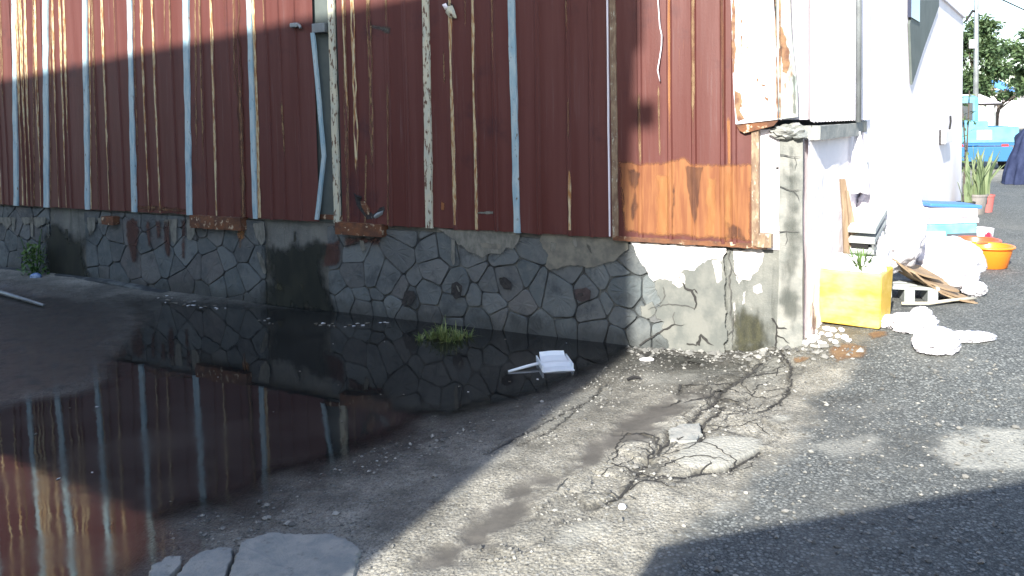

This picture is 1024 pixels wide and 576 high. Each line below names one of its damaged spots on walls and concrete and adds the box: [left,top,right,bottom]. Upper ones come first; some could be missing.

rust [618,0,751,241]
rust [756,0,795,119]
water stain [265,232,334,311]
flaking render [540,171,764,353]
crack [595,248,794,509]